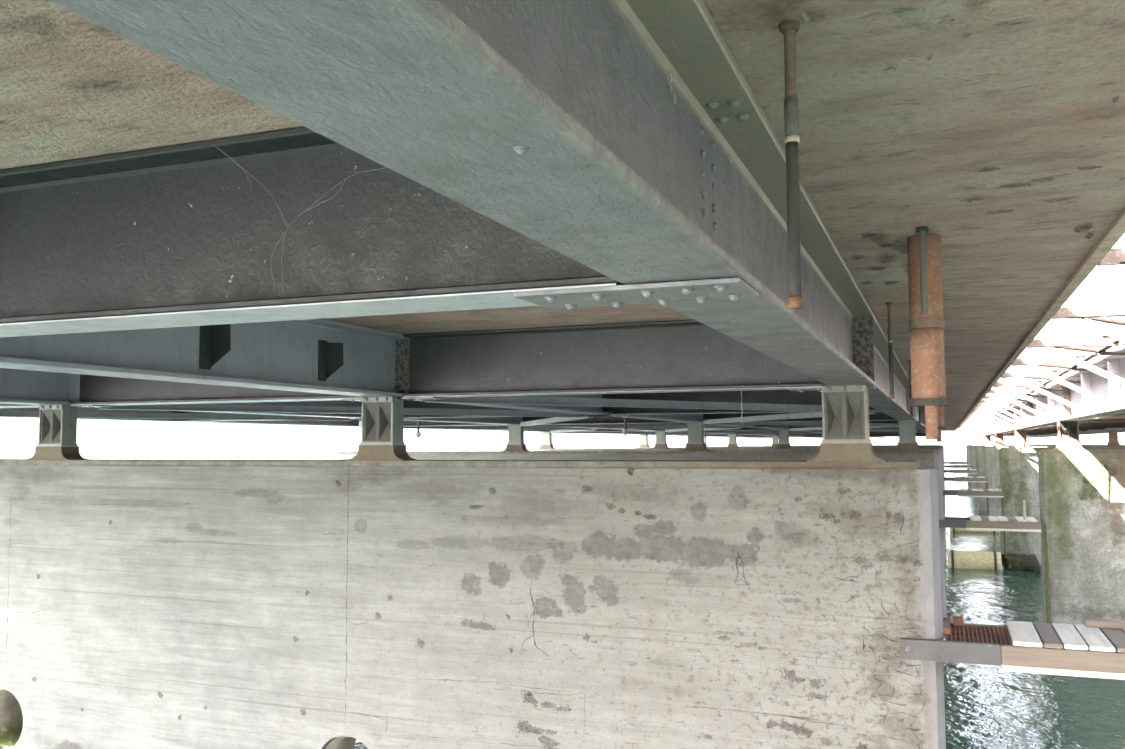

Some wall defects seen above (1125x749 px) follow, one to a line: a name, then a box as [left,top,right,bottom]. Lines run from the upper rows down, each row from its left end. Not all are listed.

crack [522,582,550,658]